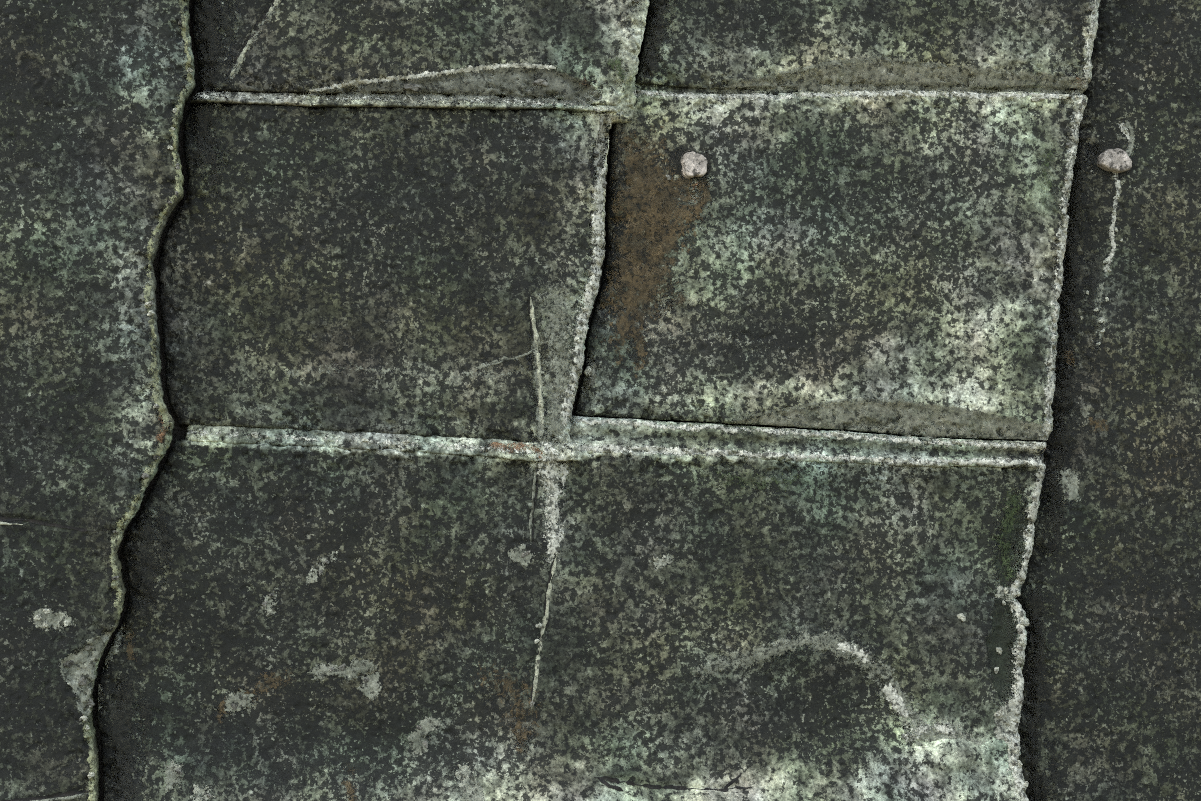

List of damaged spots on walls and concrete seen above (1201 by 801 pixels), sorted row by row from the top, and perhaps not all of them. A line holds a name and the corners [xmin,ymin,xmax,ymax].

crack [488,297,546,436]
crack [529,467,558,708]